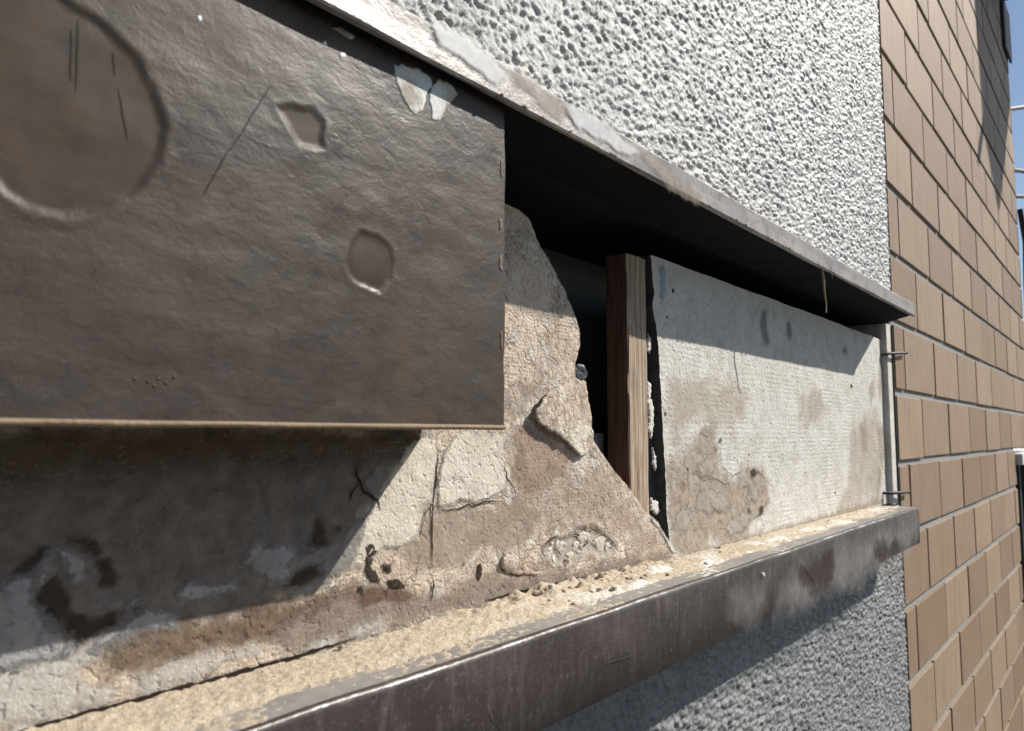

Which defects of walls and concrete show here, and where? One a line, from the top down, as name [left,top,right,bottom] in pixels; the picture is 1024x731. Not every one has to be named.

peeling [394,64,458,121]
flaking render [535,379,594,456]
peeling [647,381,656,471]
peeling [0,431,511,675]
water stain [0,428,640,724]
crack [349,467,380,508]
crack [420,450,516,601]
spalling [542,525,618,566]
peeling [650,459,760,554]